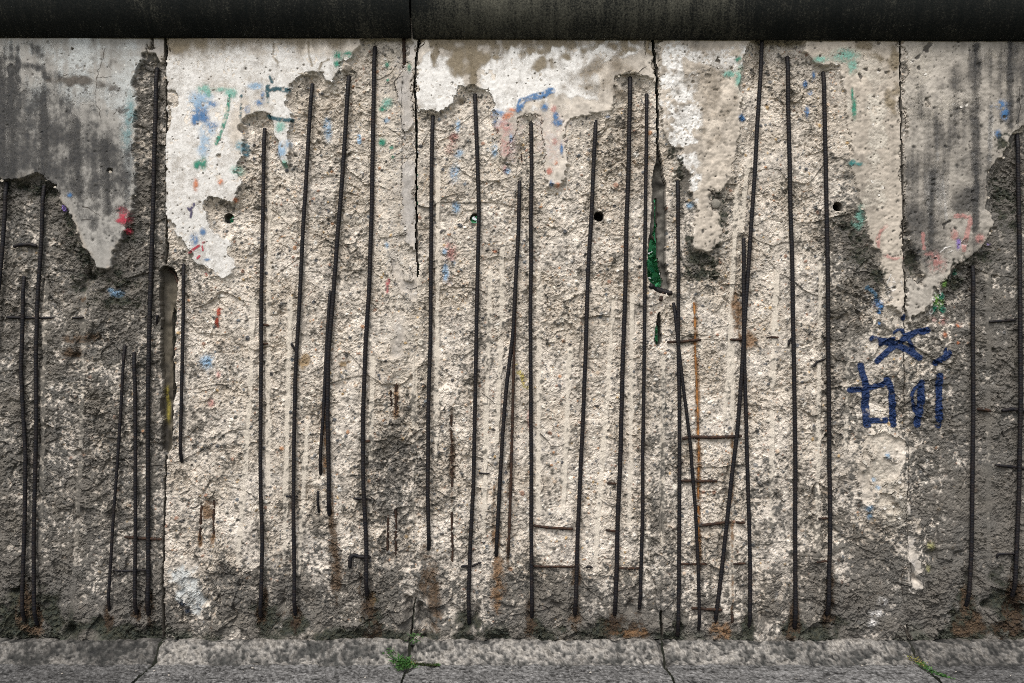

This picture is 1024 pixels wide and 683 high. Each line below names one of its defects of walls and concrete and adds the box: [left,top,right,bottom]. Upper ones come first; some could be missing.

water stain [0,44,139,234]
spalling [0,38,657,641]
crack [392,41,425,170]
crack [406,224,423,292]
spalling [607,40,1024,642]
water stain [903,41,1024,266]